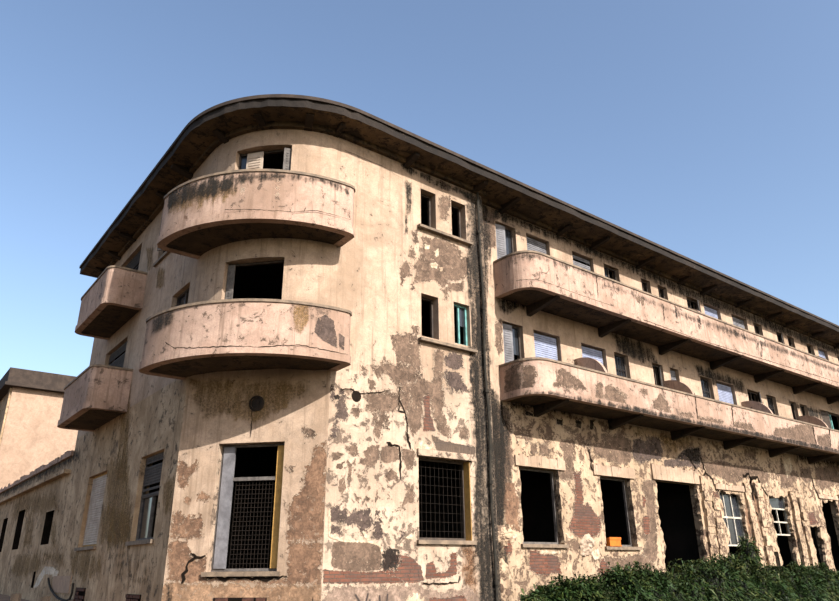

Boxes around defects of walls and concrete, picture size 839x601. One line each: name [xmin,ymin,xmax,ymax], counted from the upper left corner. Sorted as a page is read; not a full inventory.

flaking render [399,230,469,301]
flaking render [314,314,345,350]
flaking render [494,318,503,356]
flaking render [504,361,540,393]
flaking render [553,368,627,404]
water stain [401,163,839,601]
flaking render [640,388,723,424]
crack [341,387,411,479]
flaking render [161,323,480,601]
flaking render [491,404,839,576]
crack [743,473,768,517]
crack [181,553,287,584]